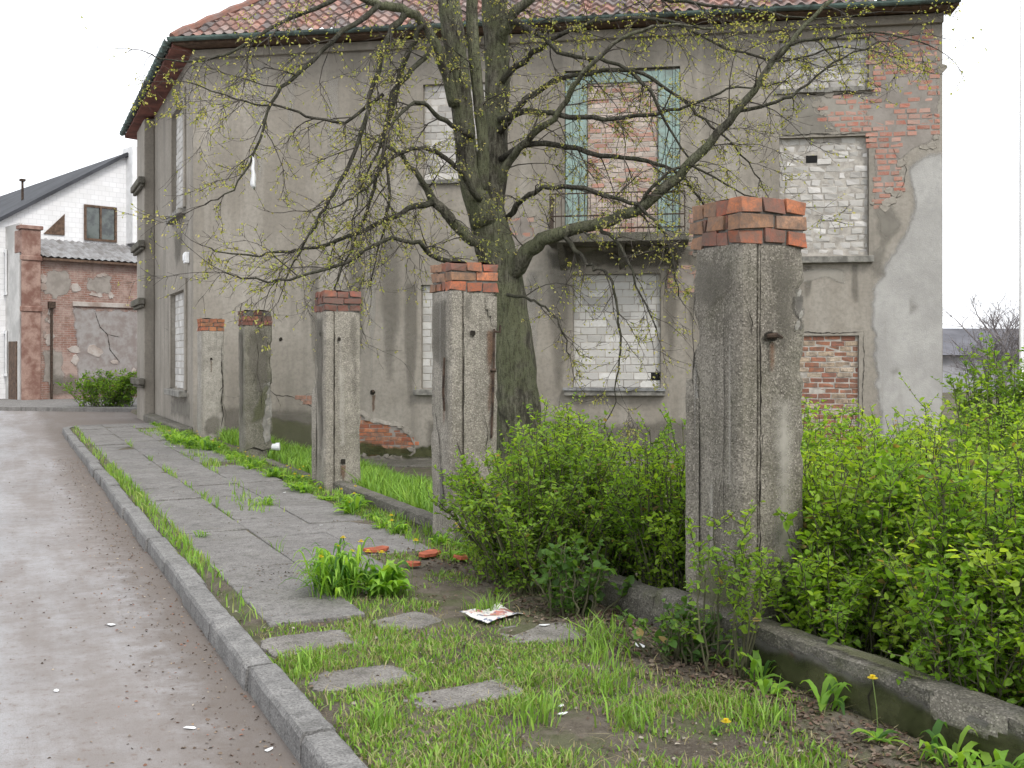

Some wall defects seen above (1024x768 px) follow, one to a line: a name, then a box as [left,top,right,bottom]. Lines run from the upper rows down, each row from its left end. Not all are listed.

peeling [812,29,948,212]
peeling [41,270,137,385]
crack [219,361,227,426]
spalling [359,410,419,460]
crack [723,249,763,552]